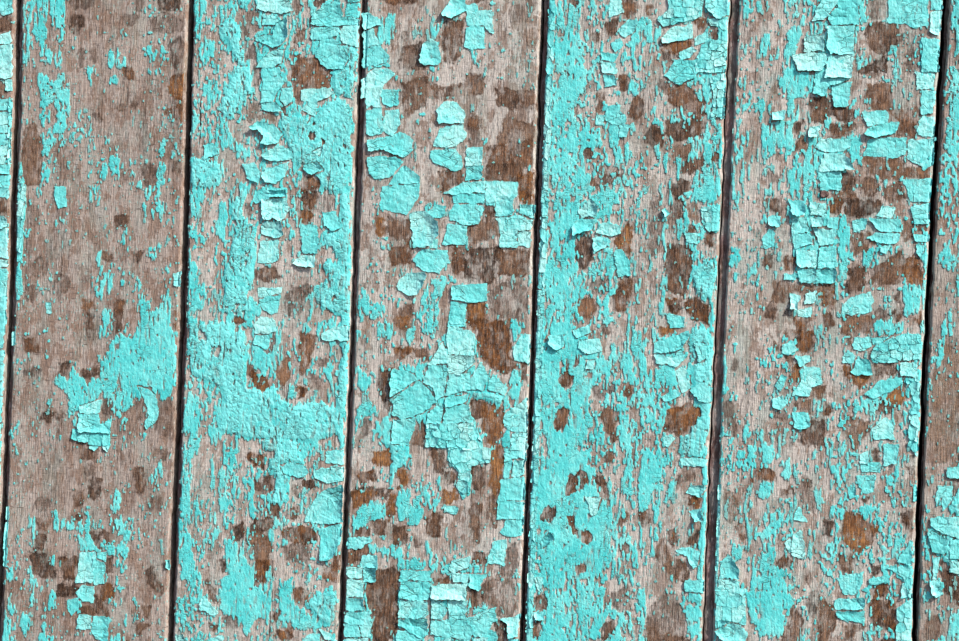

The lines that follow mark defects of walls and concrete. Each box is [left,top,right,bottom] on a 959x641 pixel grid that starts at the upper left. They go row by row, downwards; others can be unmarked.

peeling [0,0,730,641]
peeling [714,0,959,641]